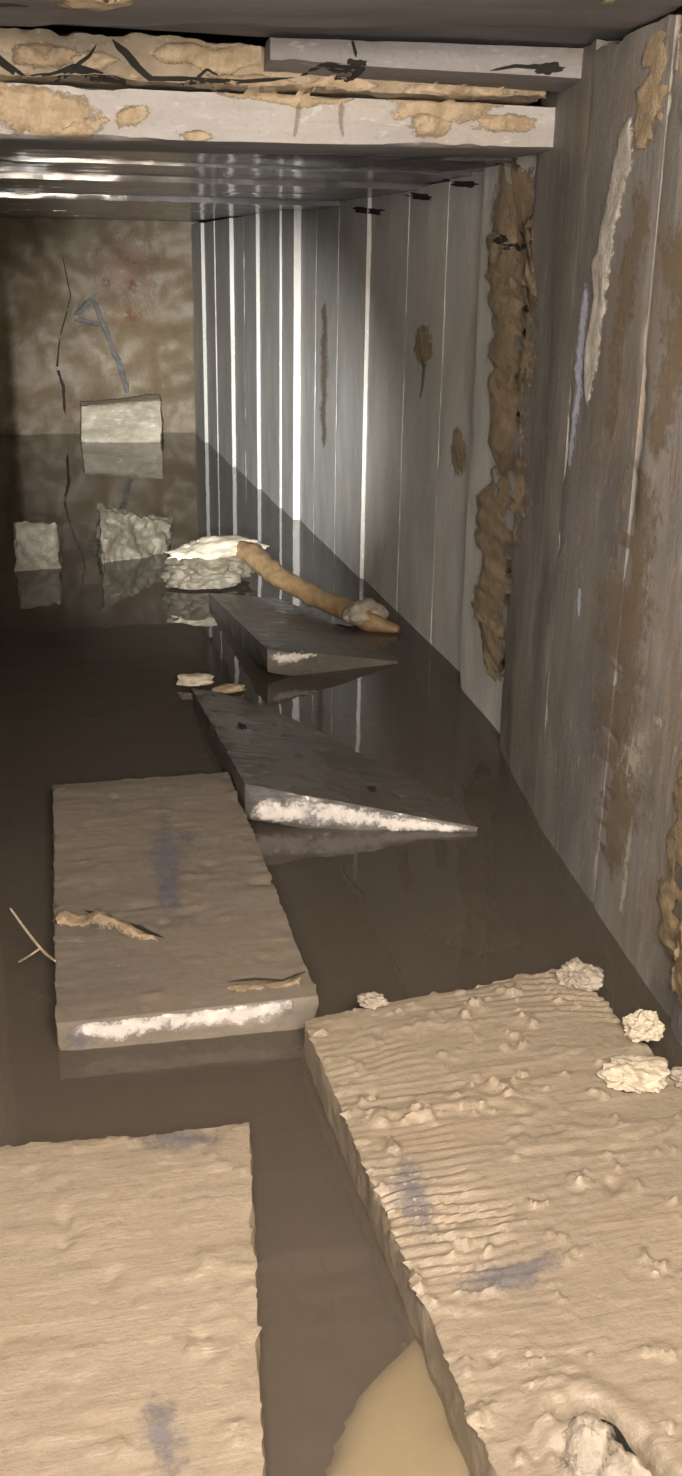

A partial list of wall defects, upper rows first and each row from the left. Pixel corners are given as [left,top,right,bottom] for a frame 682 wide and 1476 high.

spalling [0,42,121,71]
spalling [152,42,261,78]
spalling [300,40,367,82]
peeling [59,116,109,140]
peeling [669,921,682,995]